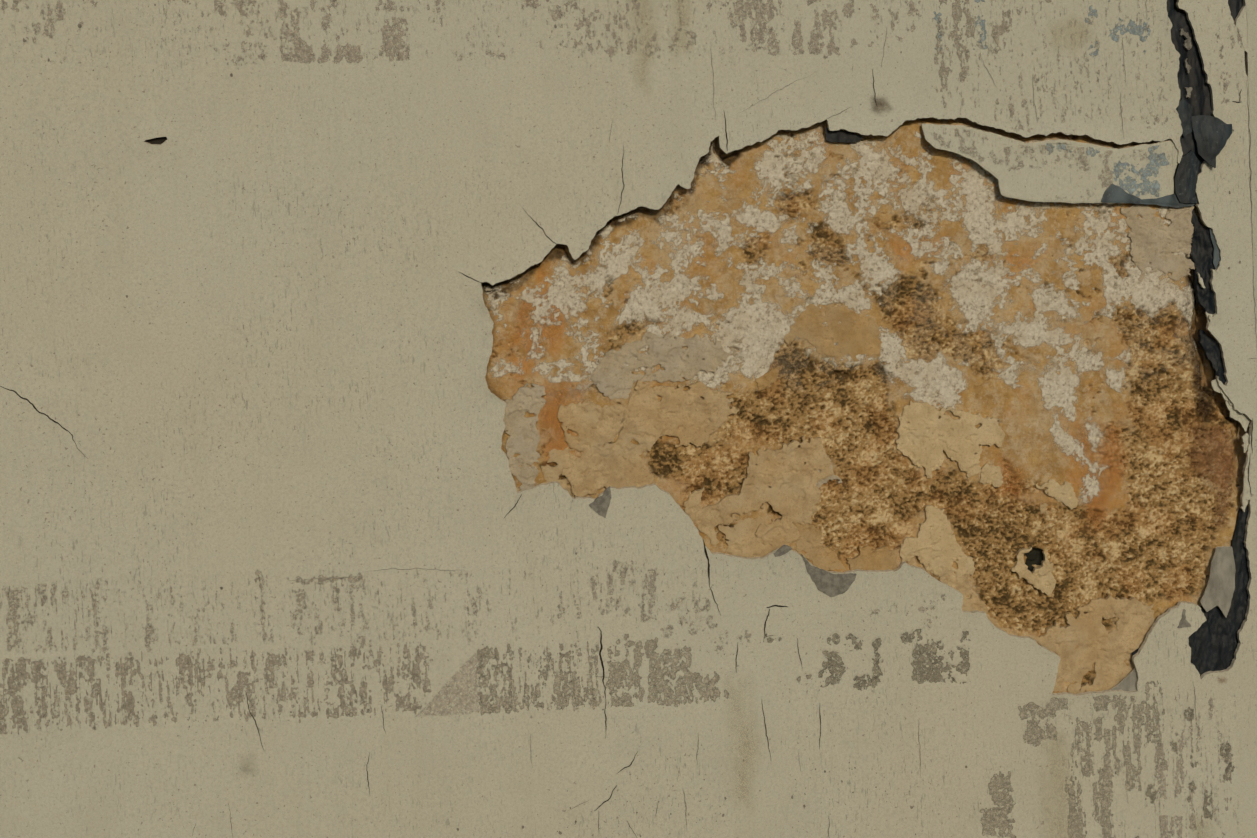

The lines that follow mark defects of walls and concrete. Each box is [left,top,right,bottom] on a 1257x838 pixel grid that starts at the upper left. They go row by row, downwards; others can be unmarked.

peeling [23,2,63,42]
crack [0,386,87,458]
spalling [481,0,1251,838]